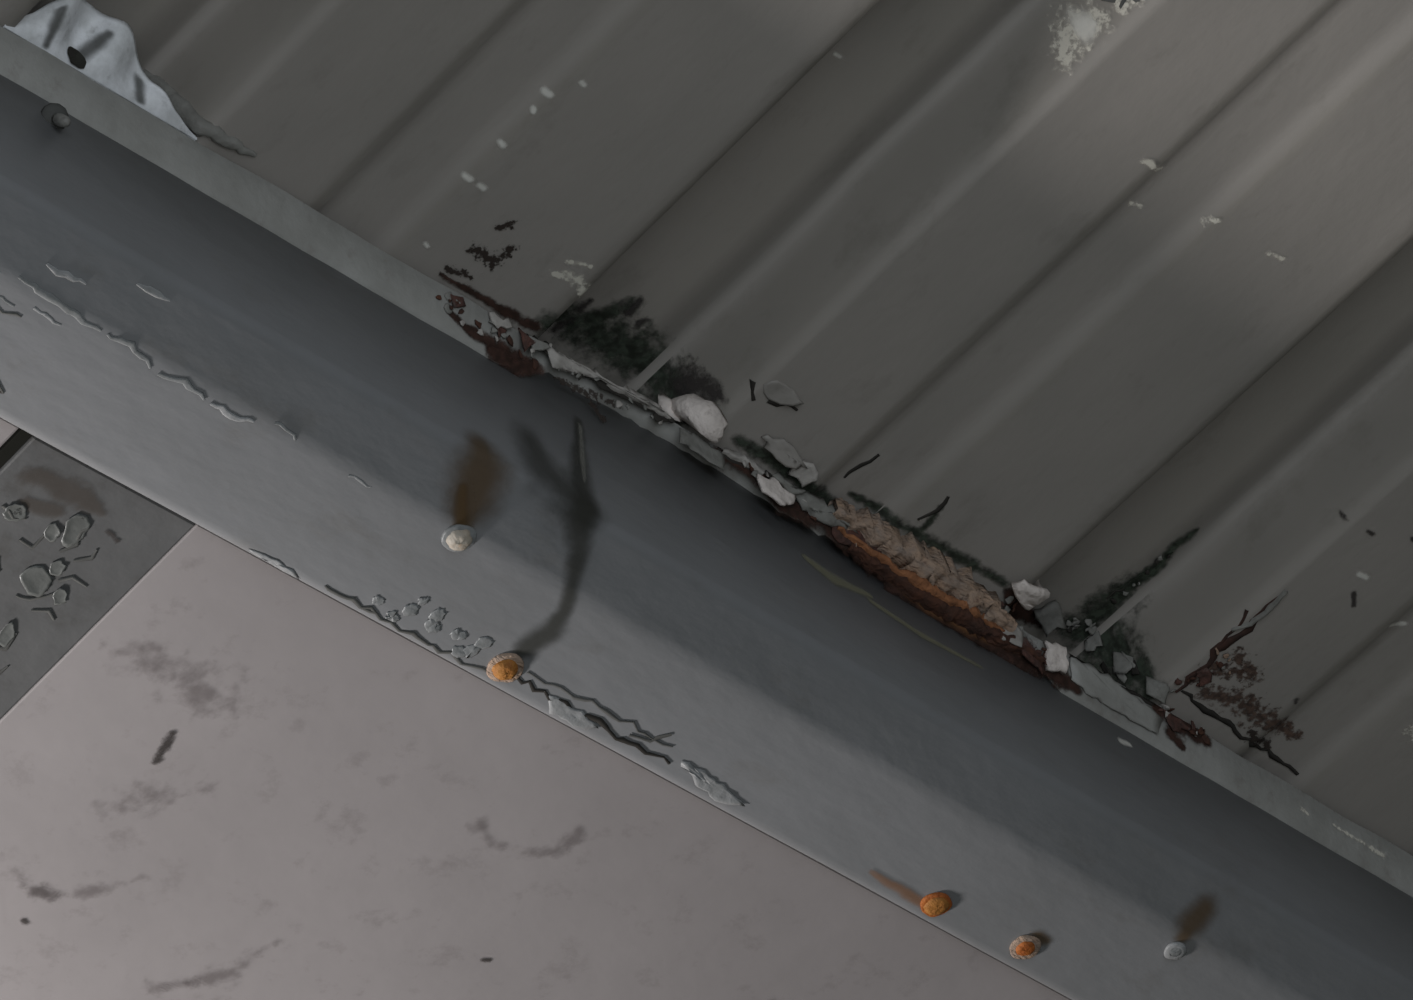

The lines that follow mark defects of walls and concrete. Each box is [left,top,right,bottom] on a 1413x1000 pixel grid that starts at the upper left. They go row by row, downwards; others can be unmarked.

peeling [1049,0,1140,75]
peeling [0,262,254,423]
water stain [539,297,691,401]
peeling [527,334,858,534]
peeling [843,454,880,478]
peeling [917,496,950,520]
corrosion [792,498,1082,695]
corrosion [1198,646,1303,750]